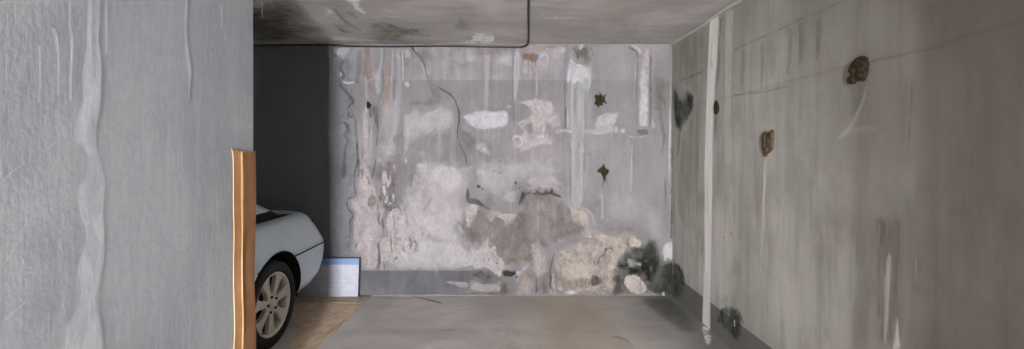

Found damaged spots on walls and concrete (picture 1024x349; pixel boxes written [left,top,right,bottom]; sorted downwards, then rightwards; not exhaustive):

crack [411,47,476,164]
water stain [53,0,104,349]
peeling [377,157,417,269]
peeling [458,204,478,233]
peeling [448,238,517,292]
peeling [490,192,516,225]
water stain [327,9,744,343]
peeling [549,207,643,294]